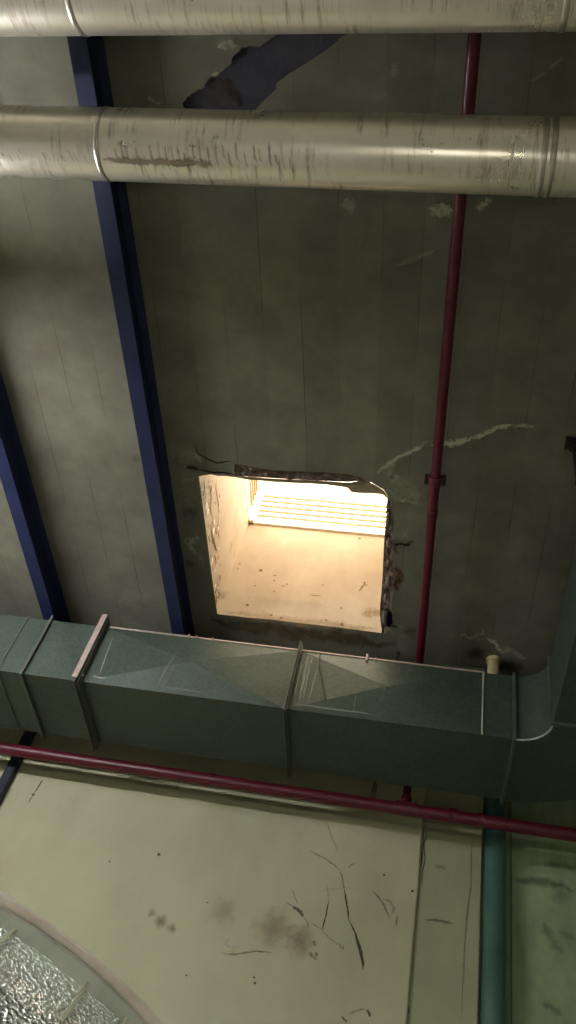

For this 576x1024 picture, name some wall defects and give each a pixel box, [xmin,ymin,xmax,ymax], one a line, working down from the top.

spalling [182,34,345,110]
crack [186,444,233,474]
crack [378,424,526,473]
crack [293,826,364,969]